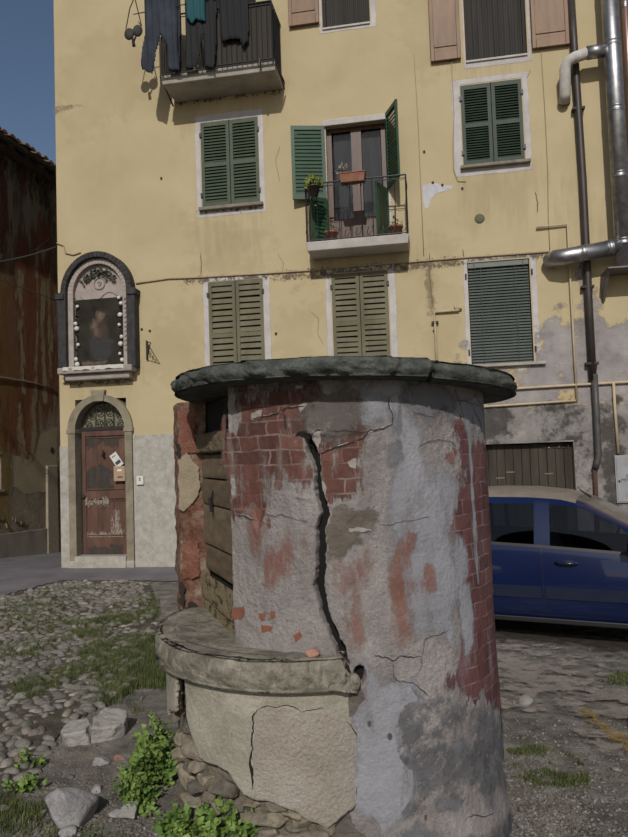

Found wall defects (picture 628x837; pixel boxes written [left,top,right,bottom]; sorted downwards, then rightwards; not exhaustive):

peeling [484,262,628,409]
flaking render [221,380,366,528]
crack [235,393,399,673]
flaking render [447,416,502,724]
crack [373,631,447,694]
crack [249,705,323,789]
damp [398,692,507,814]